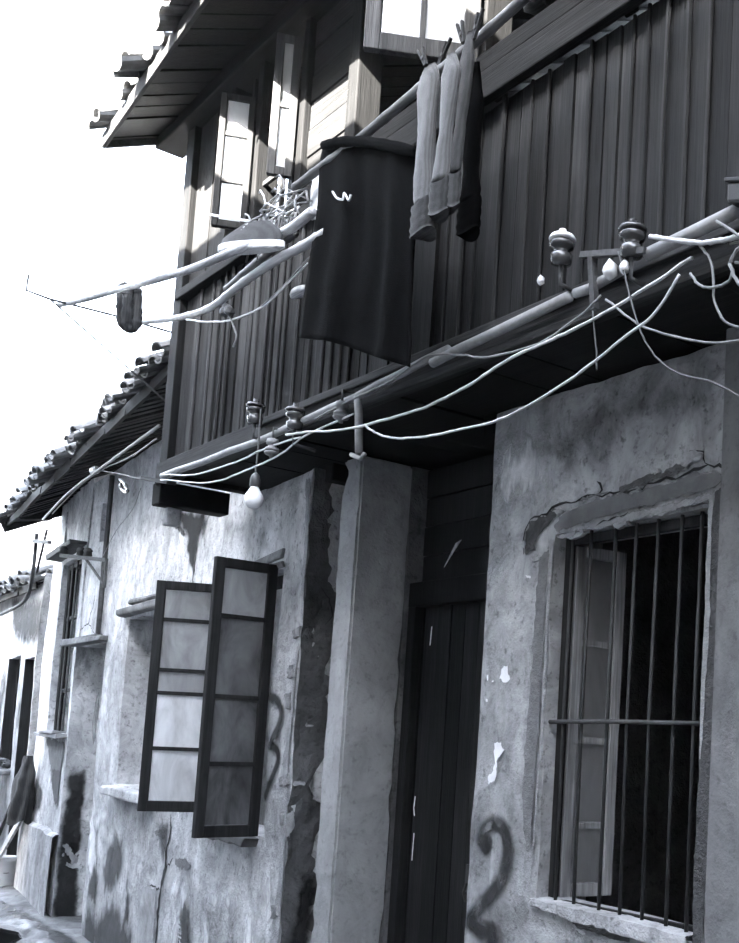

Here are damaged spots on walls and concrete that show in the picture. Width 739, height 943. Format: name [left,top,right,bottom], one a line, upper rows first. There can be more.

crack [523,450,721,554]
spalling [580,450,703,501]
peeling [487,666,510,683]
peeling [521,488,721,943]
spalling [270,626,306,943]
peeling [488,742,504,784]
leakage [171,881,189,943]
leakage [246,917,254,943]